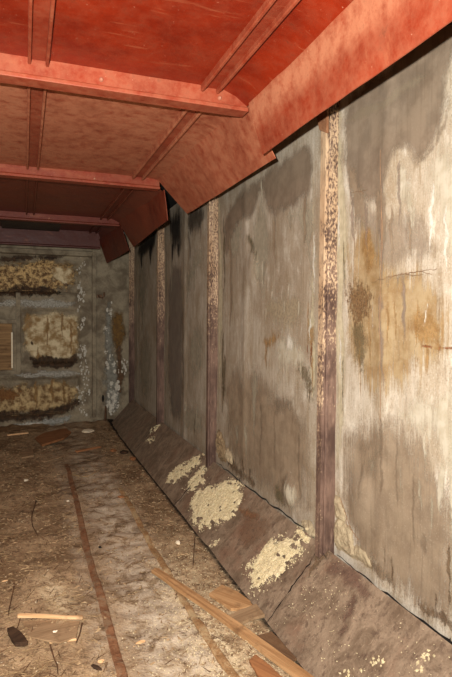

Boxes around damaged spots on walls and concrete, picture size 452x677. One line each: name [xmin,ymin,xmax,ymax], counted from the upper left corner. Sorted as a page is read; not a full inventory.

rust [112,313,126,392]
leakage [218,147,316,504]
leakage [336,22,452,628]
rust [346,224,452,394]
crack [378,269,436,338]